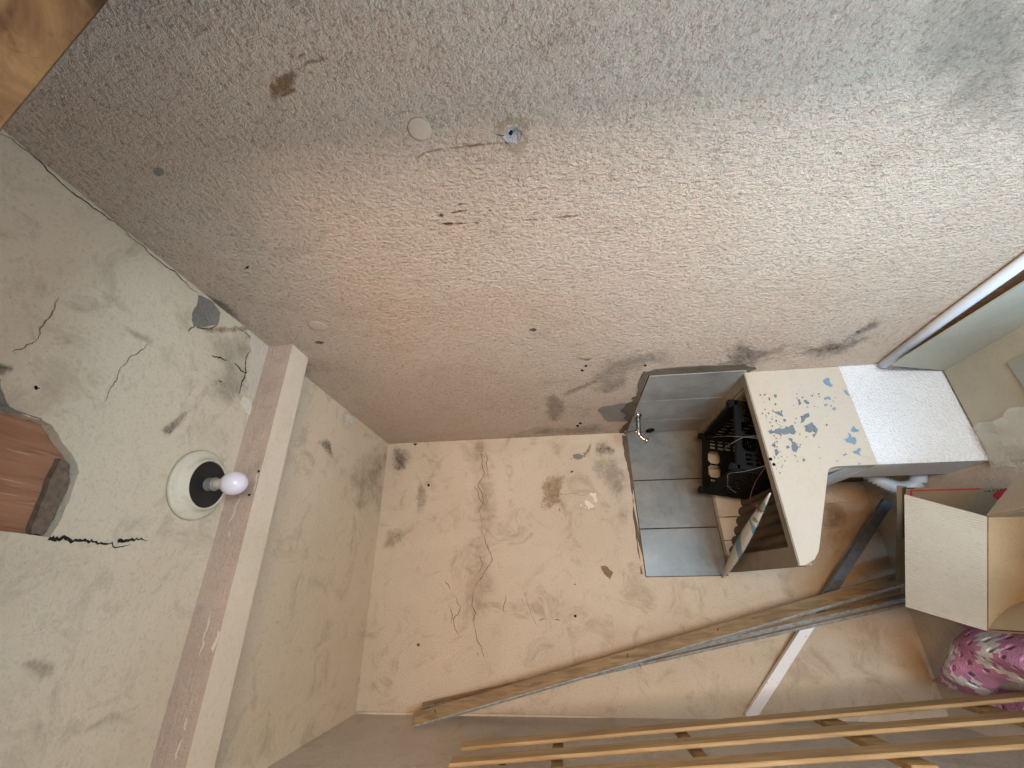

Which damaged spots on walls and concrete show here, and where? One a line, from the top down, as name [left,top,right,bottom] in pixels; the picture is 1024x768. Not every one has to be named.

water stain [271,73,295,97]
spalling [504,127,522,143]
crack [1,134,198,293]
crack [12,300,58,352]
spalling [192,295,220,327]
crack [105,344,147,402]
crack [188,325,263,394]
crack [48,535,148,548]
crack [445,447,493,658]